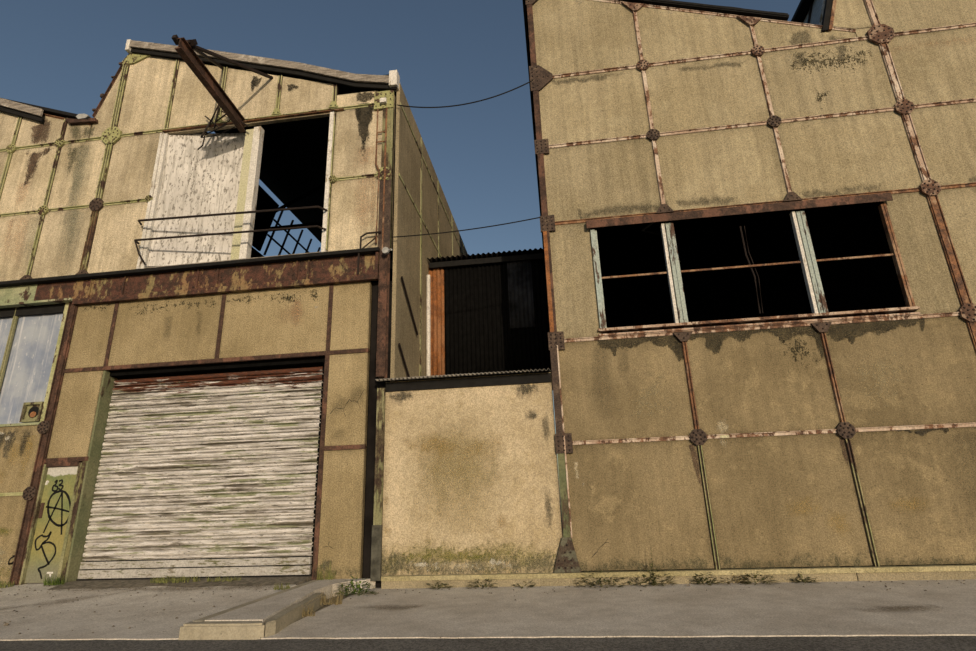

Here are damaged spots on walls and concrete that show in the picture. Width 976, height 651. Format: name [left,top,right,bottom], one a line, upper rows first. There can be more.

water stain [790,32,872,75]
water stain [24,118,52,184]
water stain [355,92,374,156]
rust [543,231,554,332]
water stain [0,431,30,457]